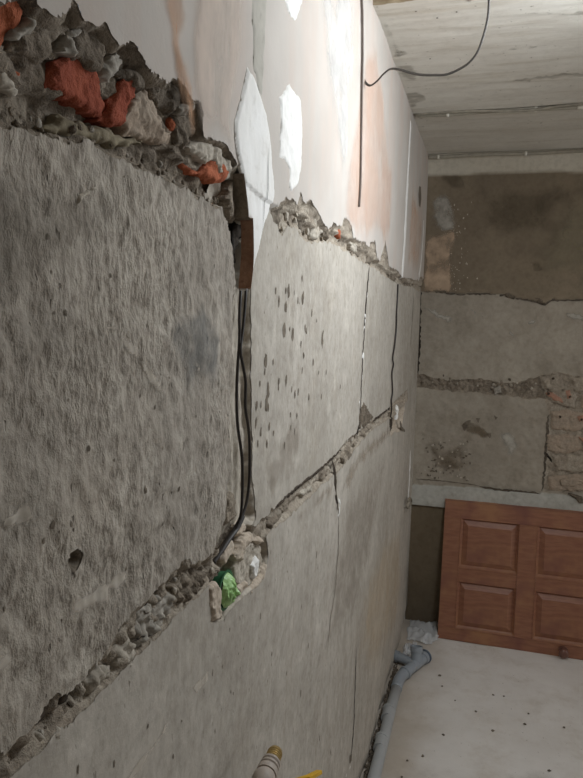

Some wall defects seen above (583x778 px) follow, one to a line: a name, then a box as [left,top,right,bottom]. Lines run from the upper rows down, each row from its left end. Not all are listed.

spalling [0,0,237,209]
spalling [270,192,583,306]
spalling [255,355,310,446]
spalling [283,311,327,374]
crack [332,456,341,516]
crack [357,273,373,435]
spalling [388,399,405,436]
flaking render [540,372,583,493]
spalling [203,491,269,624]